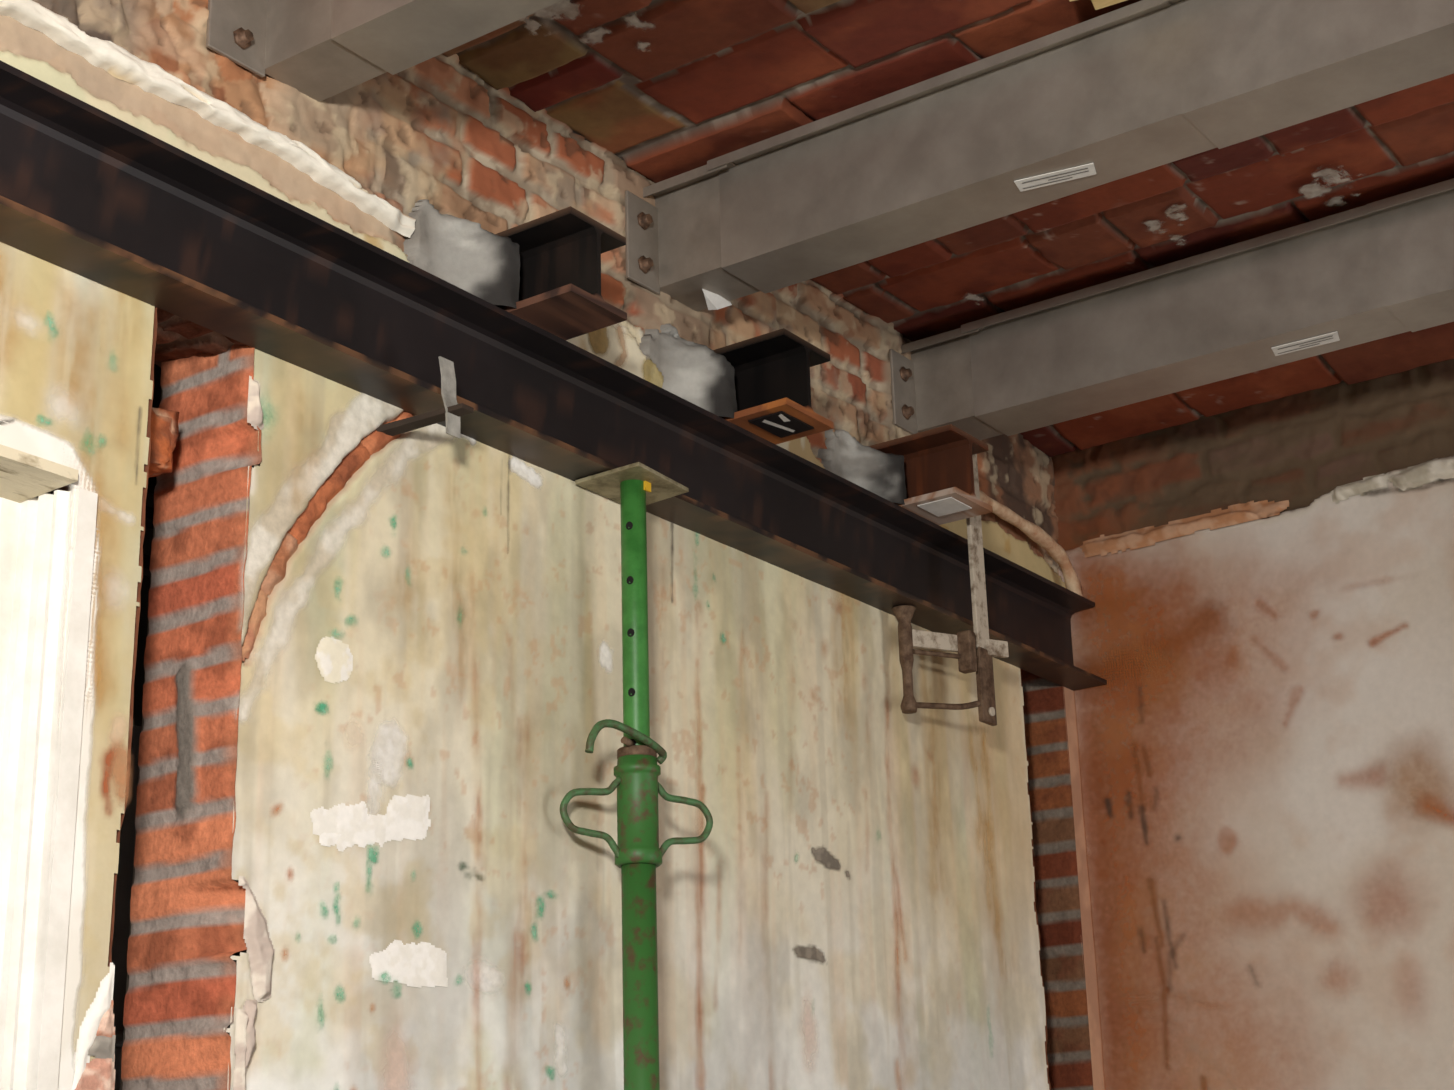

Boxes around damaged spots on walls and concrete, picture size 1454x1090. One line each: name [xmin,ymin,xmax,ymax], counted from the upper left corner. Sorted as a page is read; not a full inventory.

spalling [1331,456,1454,504]
spalling [1080,500,1289,558]
spalling [239,394,476,720]
peeling [310,721,431,852]
spalling [812,847,850,878]
peeling [369,940,448,988]
spalling [794,946,825,963]